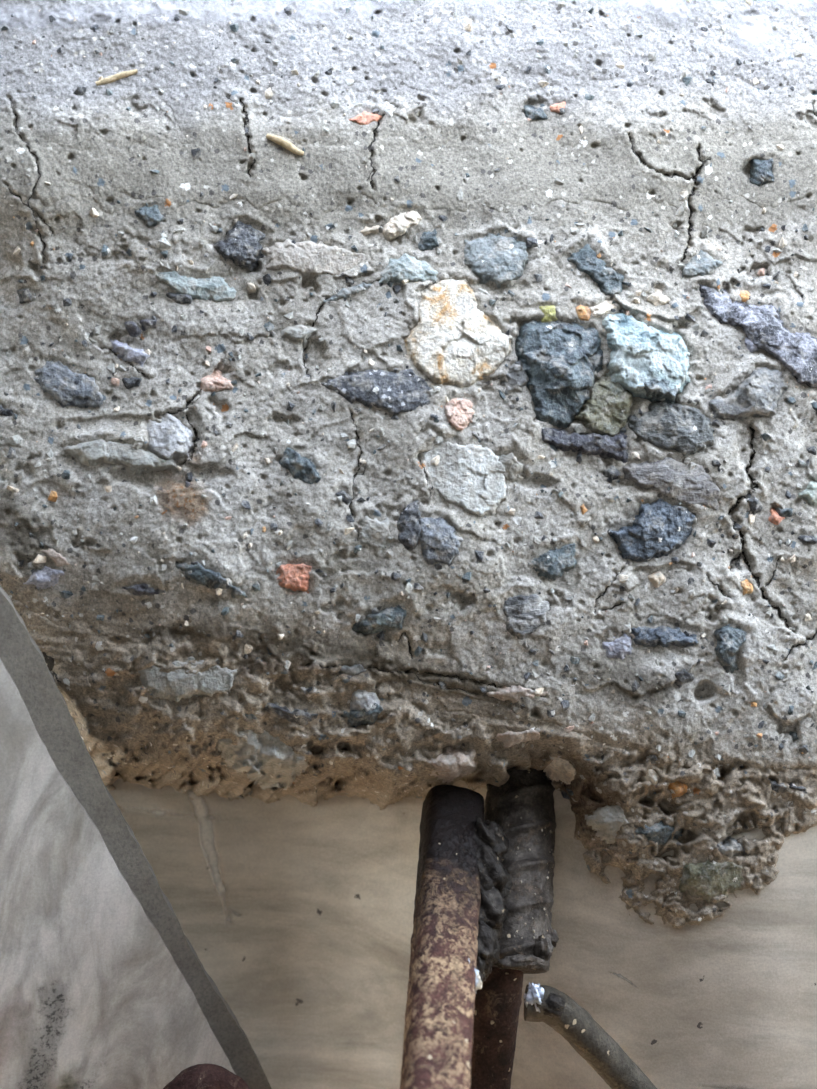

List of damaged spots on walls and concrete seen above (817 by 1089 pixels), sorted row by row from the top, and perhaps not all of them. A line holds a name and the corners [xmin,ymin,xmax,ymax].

crack [5,98,54,263]
crack [226,96,256,178]
spalling [0,0,817,187]
crack [629,133,711,261]
spalling [0,170,817,799]
crack [706,427,817,660]
spalling [484,750,576,974]
peeling [585,805,682,848]
peeling [679,836,746,903]